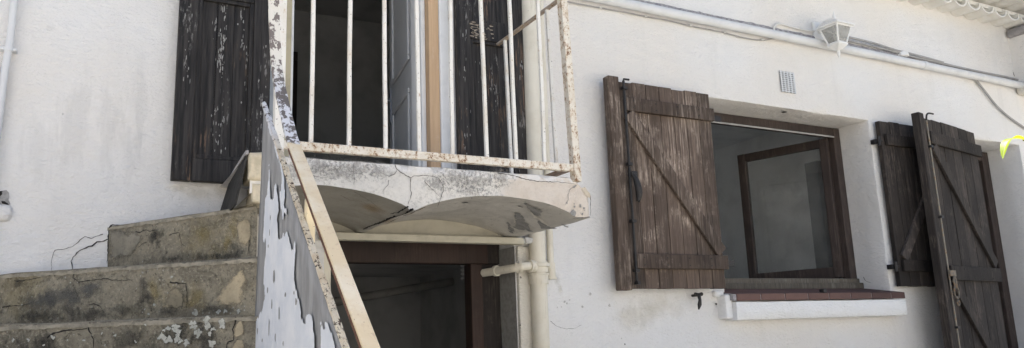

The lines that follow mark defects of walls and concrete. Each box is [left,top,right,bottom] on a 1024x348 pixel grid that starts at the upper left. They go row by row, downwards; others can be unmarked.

peeling [212,6,245,75]
peeling [233,76,335,348]
crack [313,165,444,229]
crack [497,172,591,219]
peeling [507,185,590,234]
crack [2,224,183,347]